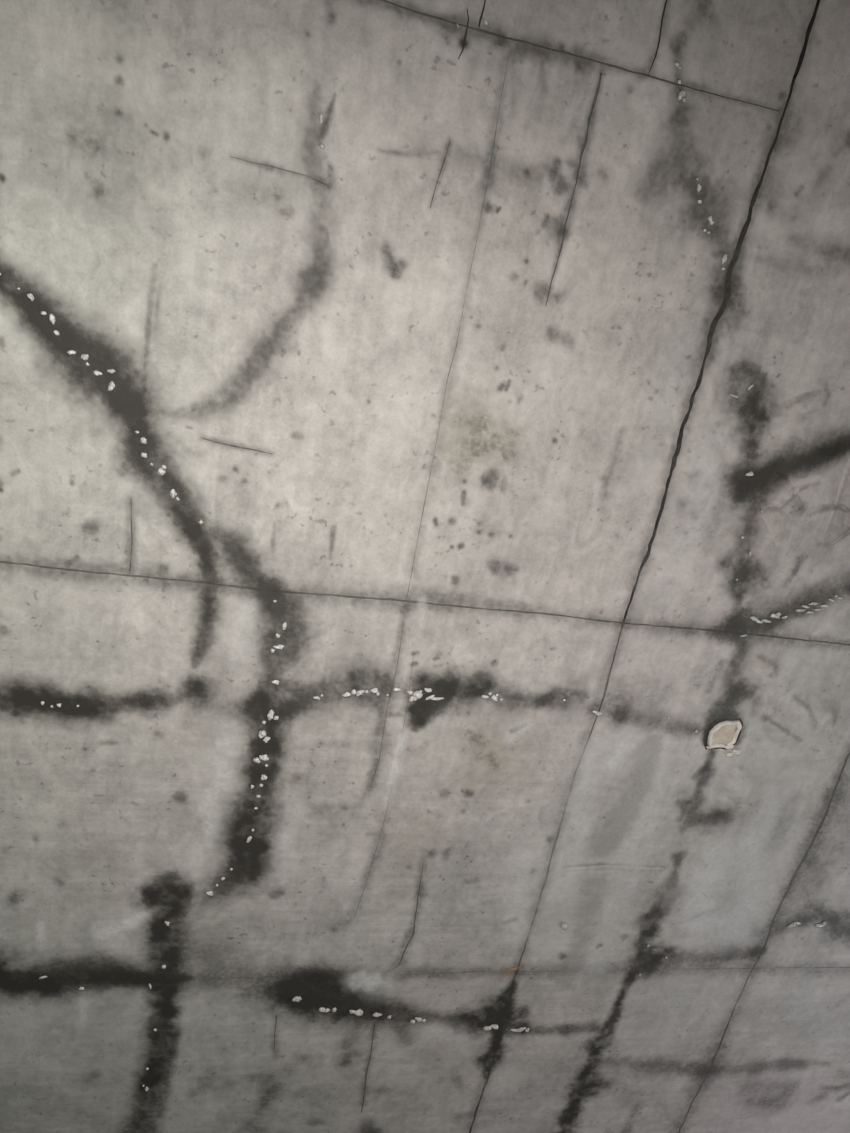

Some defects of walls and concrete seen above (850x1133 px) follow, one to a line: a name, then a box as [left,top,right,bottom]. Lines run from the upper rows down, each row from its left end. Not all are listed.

crack [457,0,488,59]
crack [648,0,667,75]
crack [545,72,602,306]
leakage [667,362,850,825]
leakage [0,248,580,1133]
leakage [592,705,638,724]
leakage [671,853,682,881]
leakage [705,947,766,961]
leakage [776,906,850,939]
leakage [557,902,682,1133]